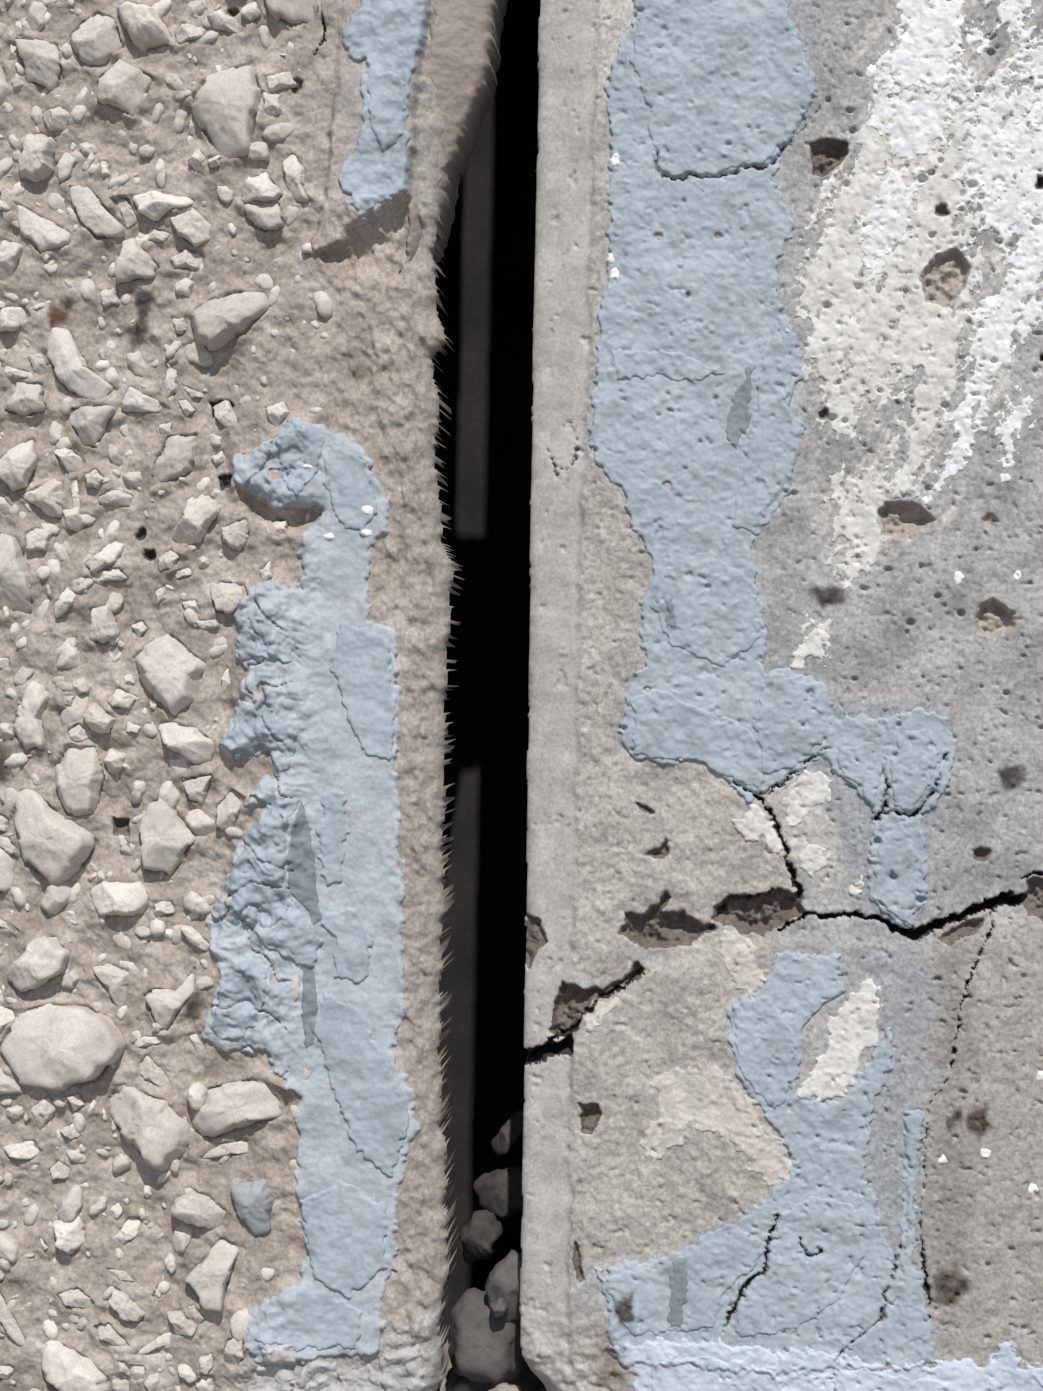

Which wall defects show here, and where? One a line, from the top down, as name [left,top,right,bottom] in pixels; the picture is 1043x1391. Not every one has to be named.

peeling [338,0,431,219]
peeling [588,0,1043,928]
leakage [812,587,845,605]
peeling [201,417,428,1391]
peeling [583,997,619,1032]
crack [525,748,1043,1374]
peeling [593,930,1043,1391]